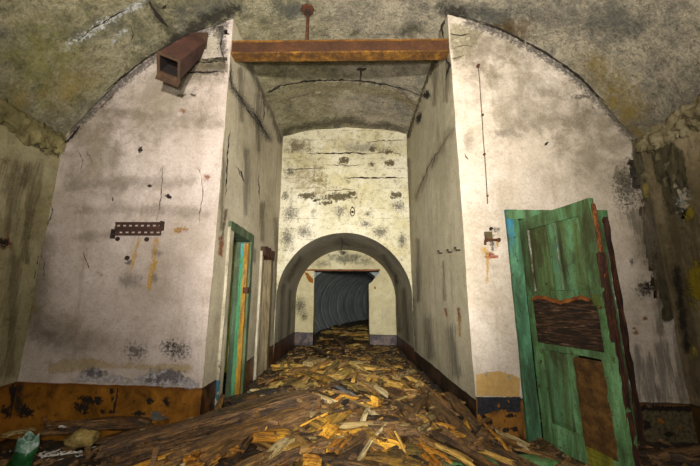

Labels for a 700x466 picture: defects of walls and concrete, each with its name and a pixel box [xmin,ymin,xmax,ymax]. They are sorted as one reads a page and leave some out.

spalling [631,138,688,322]